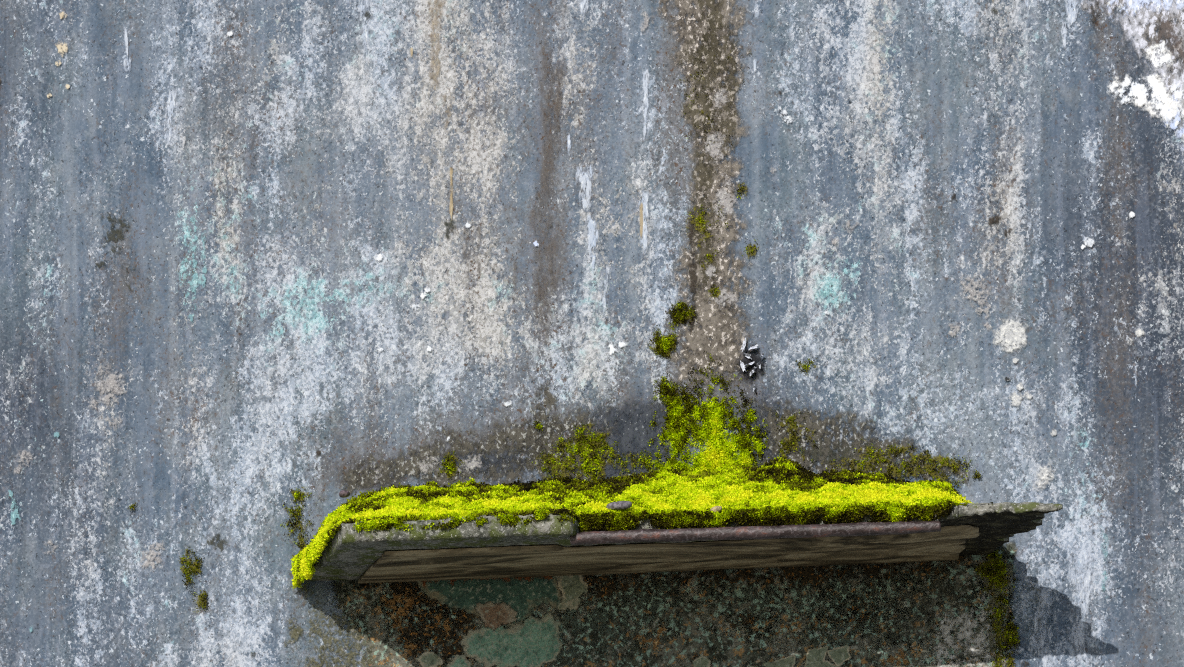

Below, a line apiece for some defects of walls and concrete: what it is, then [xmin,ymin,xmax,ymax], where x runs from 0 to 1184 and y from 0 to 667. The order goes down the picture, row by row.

water stain [1062,0,1099,47]
water stain [341,0,756,495]
peeling [415,575,588,667]
peeling [747,645,852,667]